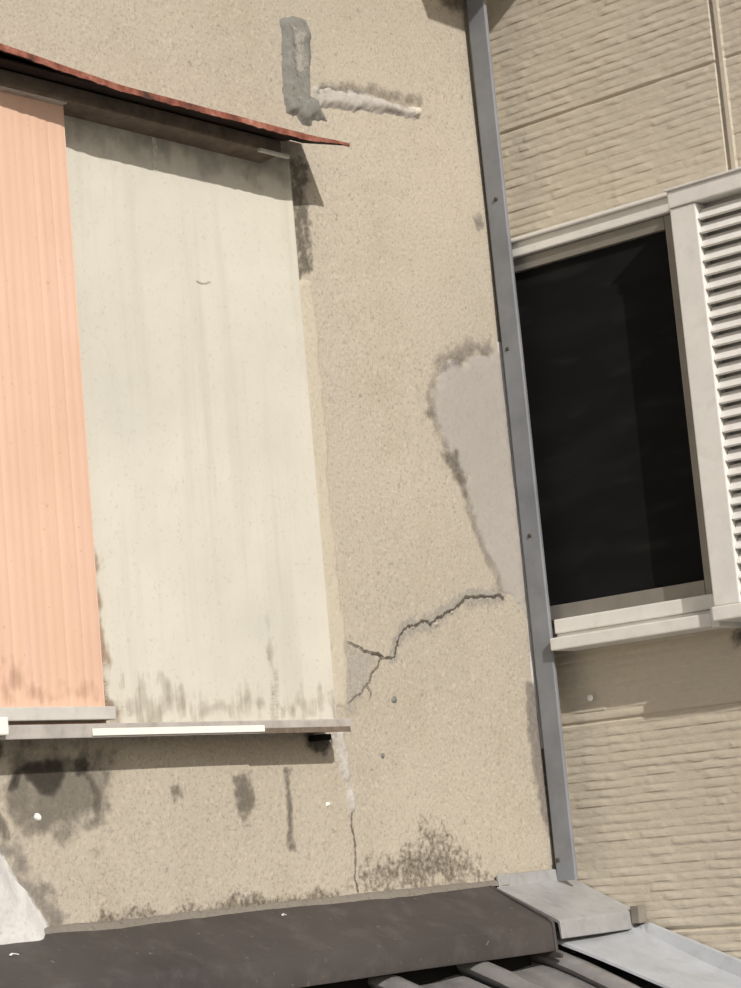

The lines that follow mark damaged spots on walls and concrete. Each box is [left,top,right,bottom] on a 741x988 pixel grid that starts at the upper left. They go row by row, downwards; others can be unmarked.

crack [345,589,504,709]
water stain [9,760,64,794]
water stain [75,760,101,811]
water stain [234,777,255,811]
water stain [285,770,294,849]
crack [351,812,359,894]